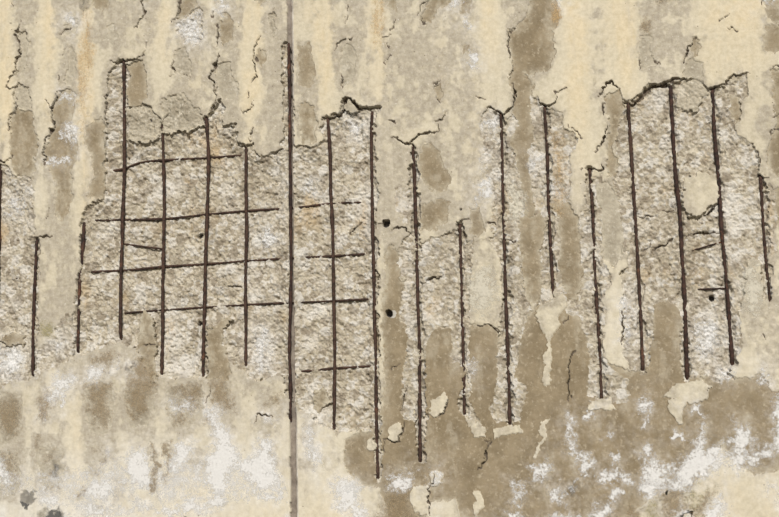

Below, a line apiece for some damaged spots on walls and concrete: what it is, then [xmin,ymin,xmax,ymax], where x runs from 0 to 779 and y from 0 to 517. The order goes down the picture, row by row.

crack [42,75,62,165]
crack [169,11,220,115]
crack [239,36,261,148]
crack [321,75,446,145]
peeling [410,141,452,355]
spalling [543,105,584,301]
spalling [711,69,779,366]
water stain [86,353,120,419]
spalling [593,249,603,399]
water stain [0,382,285,517]
water stain [530,463,551,482]
water stain [550,393,779,517]